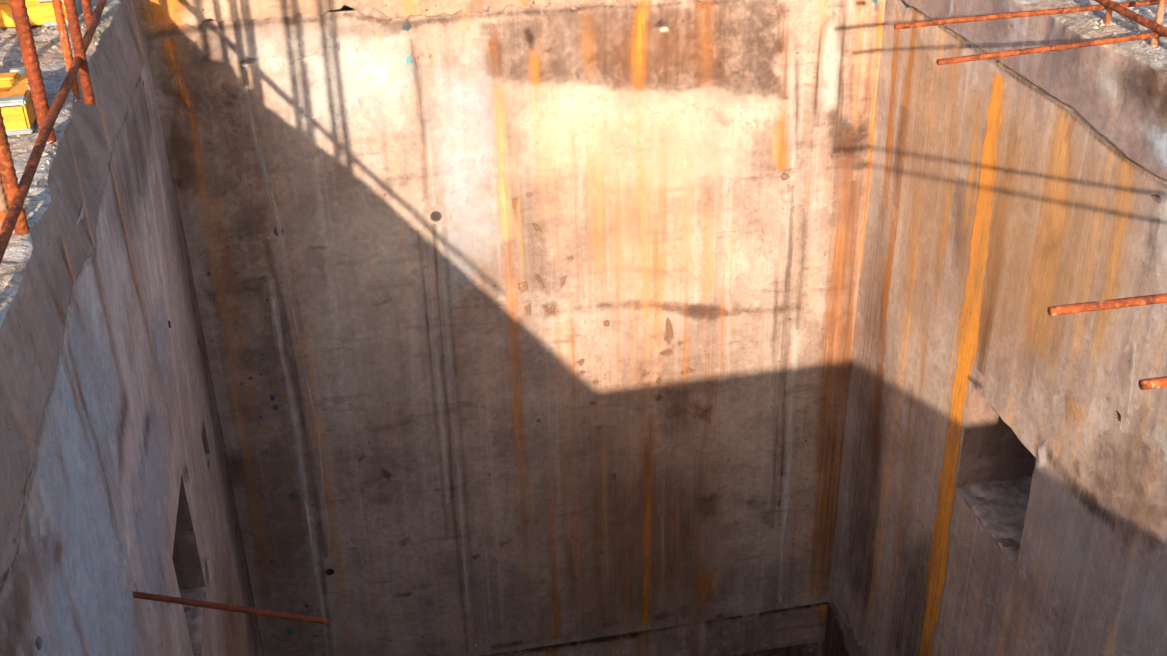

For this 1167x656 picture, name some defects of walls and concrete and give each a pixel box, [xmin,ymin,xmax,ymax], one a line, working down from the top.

rust [634,1,649,86]
leakage [523,4,783,95]
rust [868,5,916,176]
rust [864,108,875,224]
leakage [525,304,555,315]
leakage [624,302,746,356]
rust [872,223,897,458]
rust [919,74,1013,656]